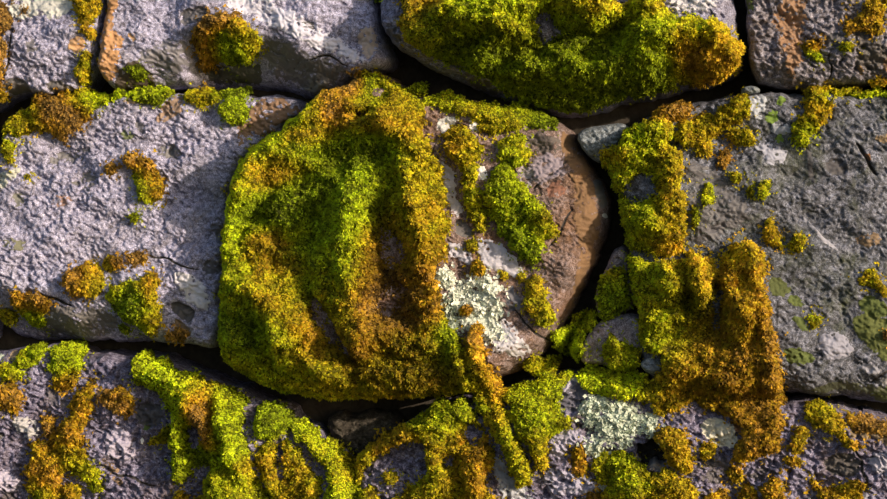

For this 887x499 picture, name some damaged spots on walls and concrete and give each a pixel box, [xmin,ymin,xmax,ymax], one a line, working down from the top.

crack [307,54,347,67]
crack [150,256,199,270]